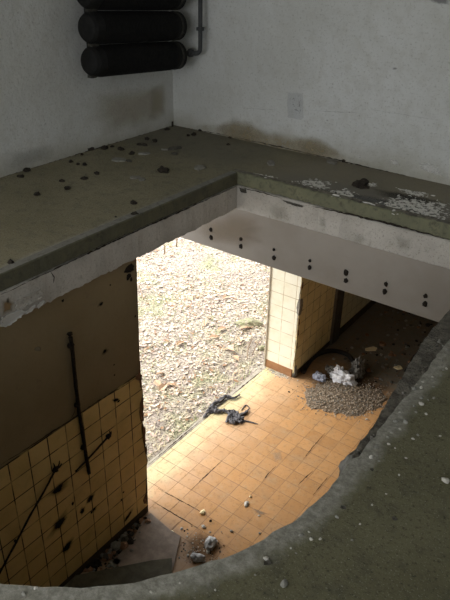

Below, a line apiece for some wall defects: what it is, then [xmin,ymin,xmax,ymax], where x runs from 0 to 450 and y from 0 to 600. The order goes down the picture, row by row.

peeling [292,179,450,224]
flaking render [0,300,45,327]
crack [156,463,219,527]